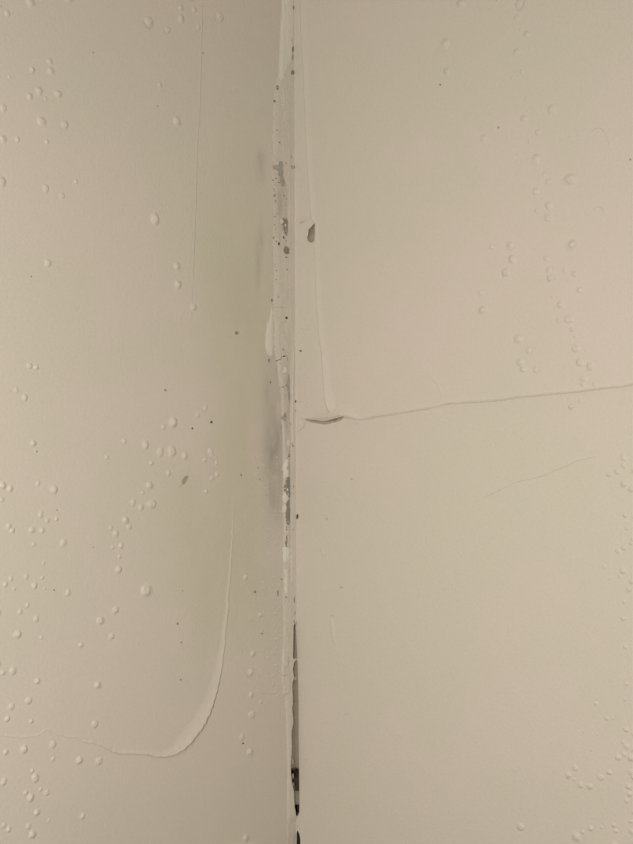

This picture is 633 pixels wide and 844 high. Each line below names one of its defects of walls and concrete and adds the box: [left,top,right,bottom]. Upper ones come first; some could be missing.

spalling [281,460,291,525]
crack [291,624,300,844]